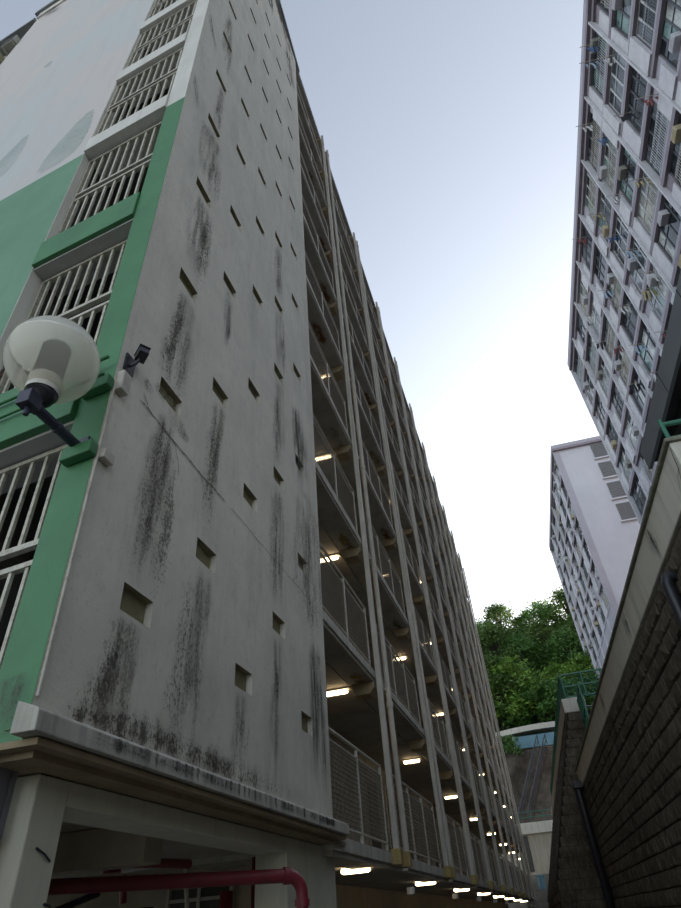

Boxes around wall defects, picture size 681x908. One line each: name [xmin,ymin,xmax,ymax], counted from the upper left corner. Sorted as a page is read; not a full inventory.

leakage [139,417,171,542]
leakage [97,625,335,825]